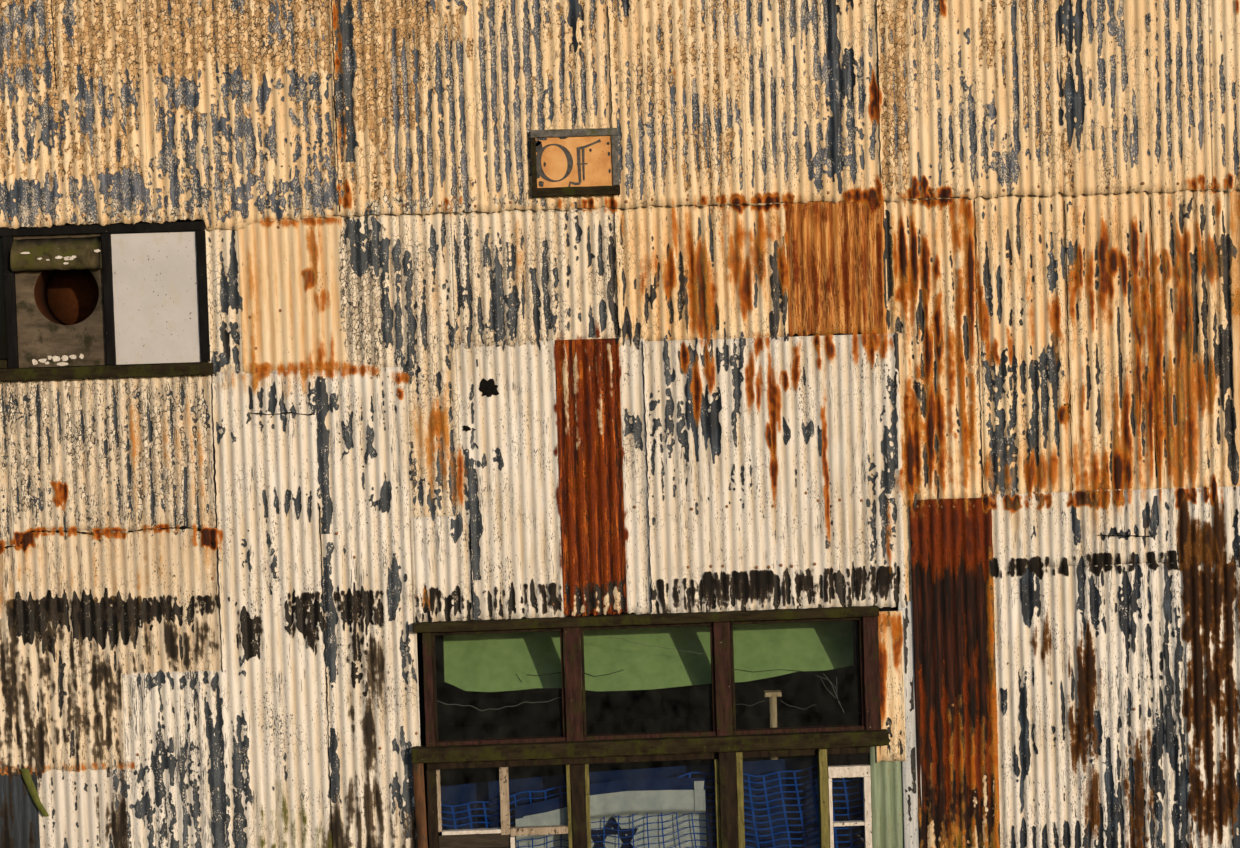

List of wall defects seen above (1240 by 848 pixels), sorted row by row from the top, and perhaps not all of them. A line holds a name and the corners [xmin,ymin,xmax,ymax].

rust [260,178,352,311]
peeling [866,0,1240,576]
rust [0,526,77,554]
leakage [0,588,264,848]
peeling [43,624,288,848]
peeling [328,728,342,804]
peeling [389,726,415,839]
leakage [415,576,626,622]
rust [554,325,629,612]
leakage [651,561,907,614]
rust [640,173,1240,848]
peeling [1000,491,1194,848]